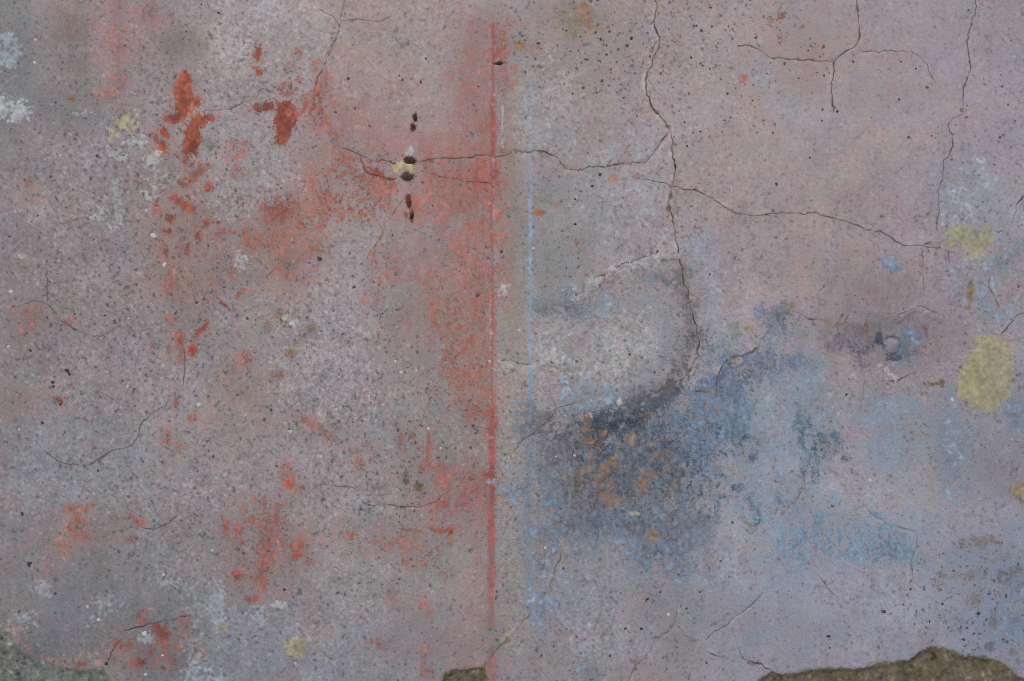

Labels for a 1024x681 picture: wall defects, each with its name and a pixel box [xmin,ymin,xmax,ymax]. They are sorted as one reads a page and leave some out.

crack [313,0,392,102]
crack [342,0,977,431]
crack [995,195,1024,233]
crack [987,269,1024,336]
spalling [754,612,1024,681]